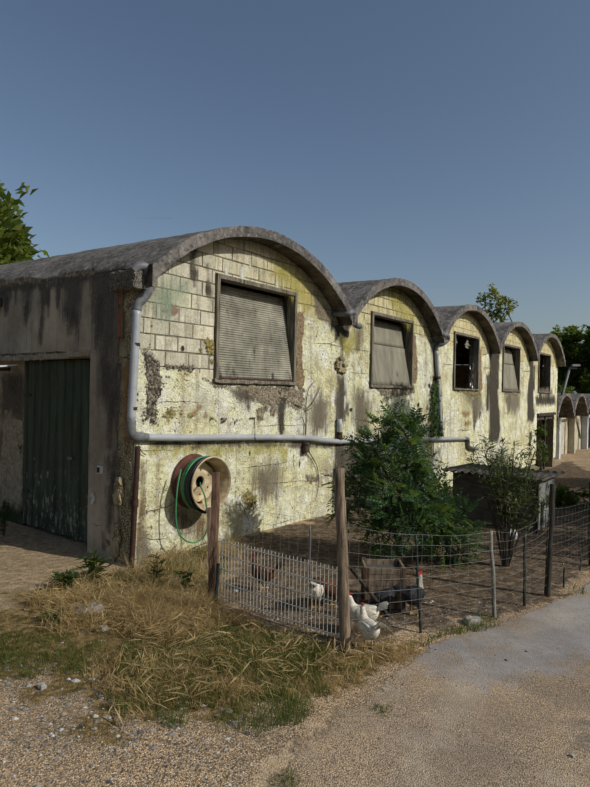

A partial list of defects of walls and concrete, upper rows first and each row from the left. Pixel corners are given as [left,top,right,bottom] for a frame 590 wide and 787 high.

leakage [0,263,120,550]
spalling [142,348,195,425]
spalling [200,311,305,422]
leakage [150,375,379,508]
leakage [315,296,362,363]
leakage [466,350,555,442]